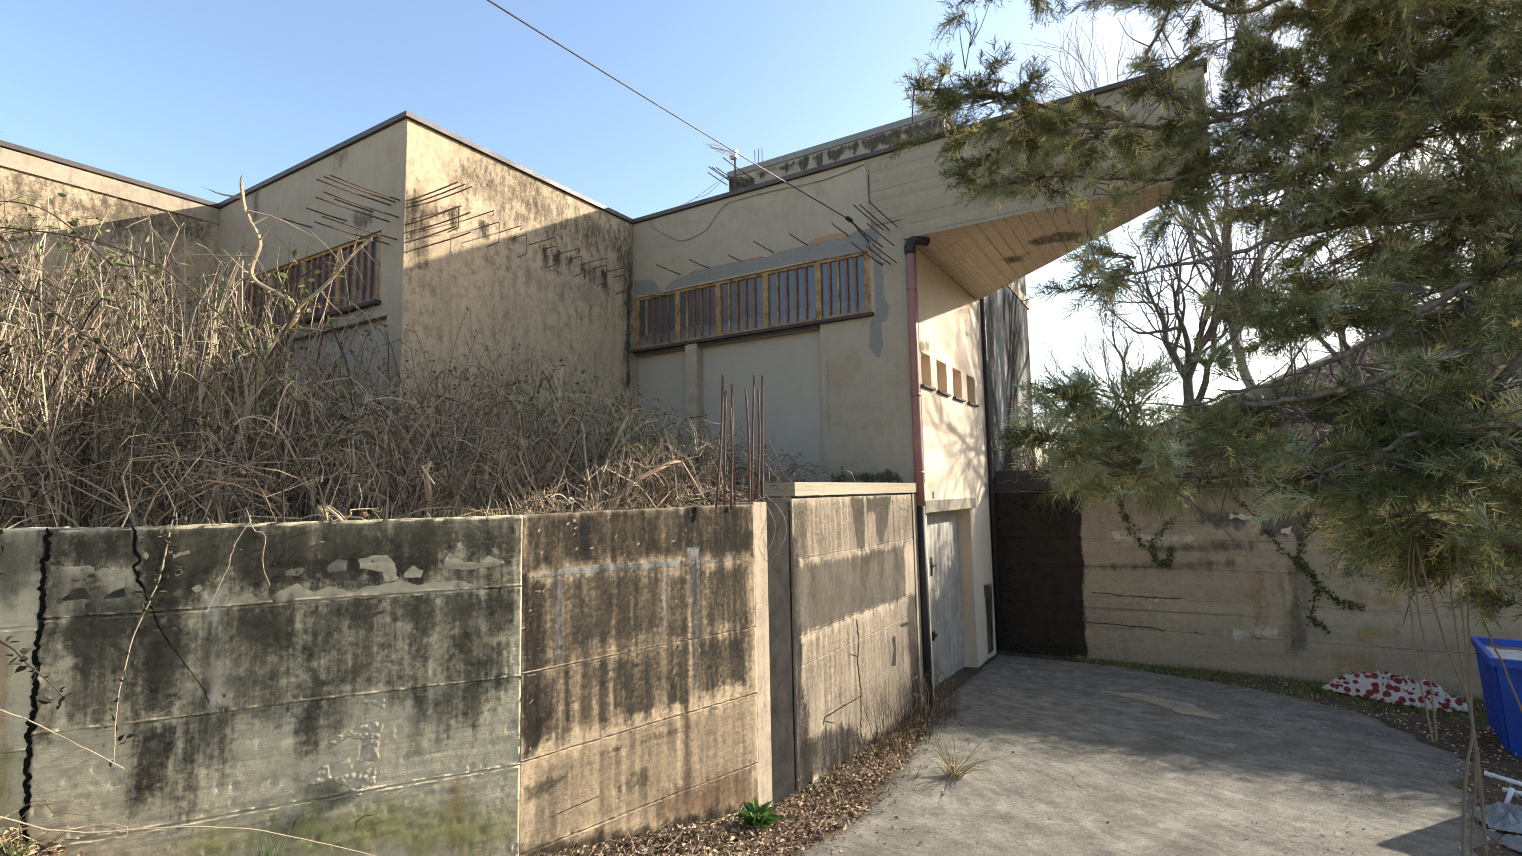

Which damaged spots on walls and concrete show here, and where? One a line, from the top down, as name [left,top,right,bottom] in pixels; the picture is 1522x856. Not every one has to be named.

leakage [405,190,457,268]
leakage [459,167,633,388]
crack [19,528,53,842]
peeling [173,550,202,597]
peeling [228,554,504,607]
leakage [0,504,754,819]
leakage [792,469,920,793]
leakage [526,800,759,856]